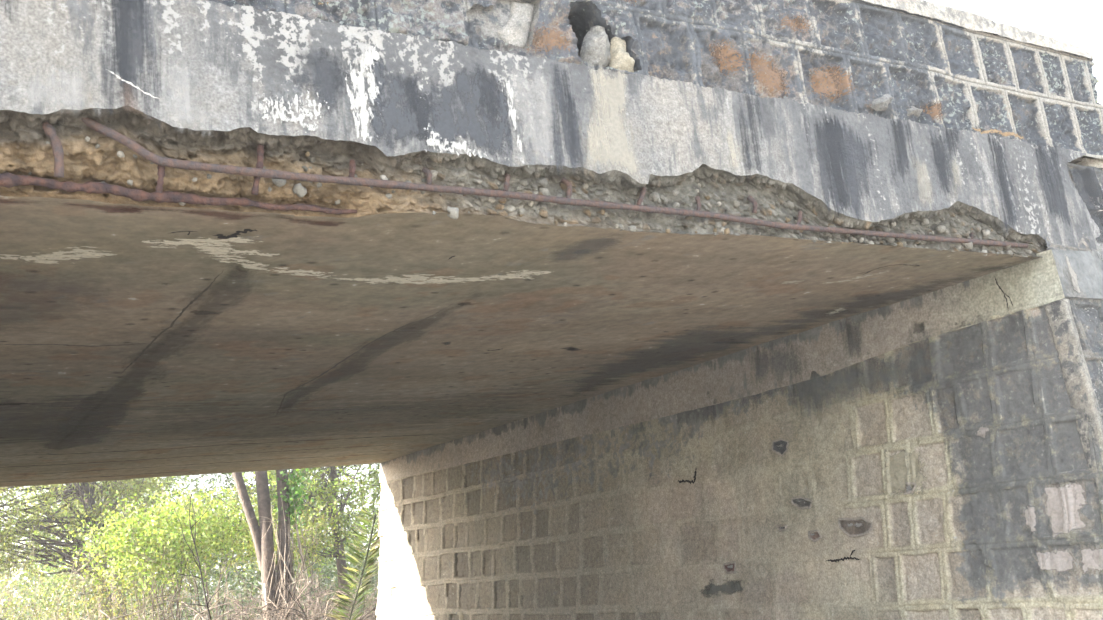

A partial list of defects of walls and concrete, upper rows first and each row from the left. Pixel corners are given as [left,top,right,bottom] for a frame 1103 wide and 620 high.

water stain [101,0,161,106]
corrosion [68,204,251,220]
corrosion [286,218,344,226]
water stain [295,54,349,108]
water stain [367,56,513,155]
spalling [0,42,1048,257]
water stain [806,119,872,217]
water stain [891,118,912,181]
water stain [930,127,958,192]
water stain [989,138,1017,233]
crack [5,271,223,371]
spalling [837,516,874,538]